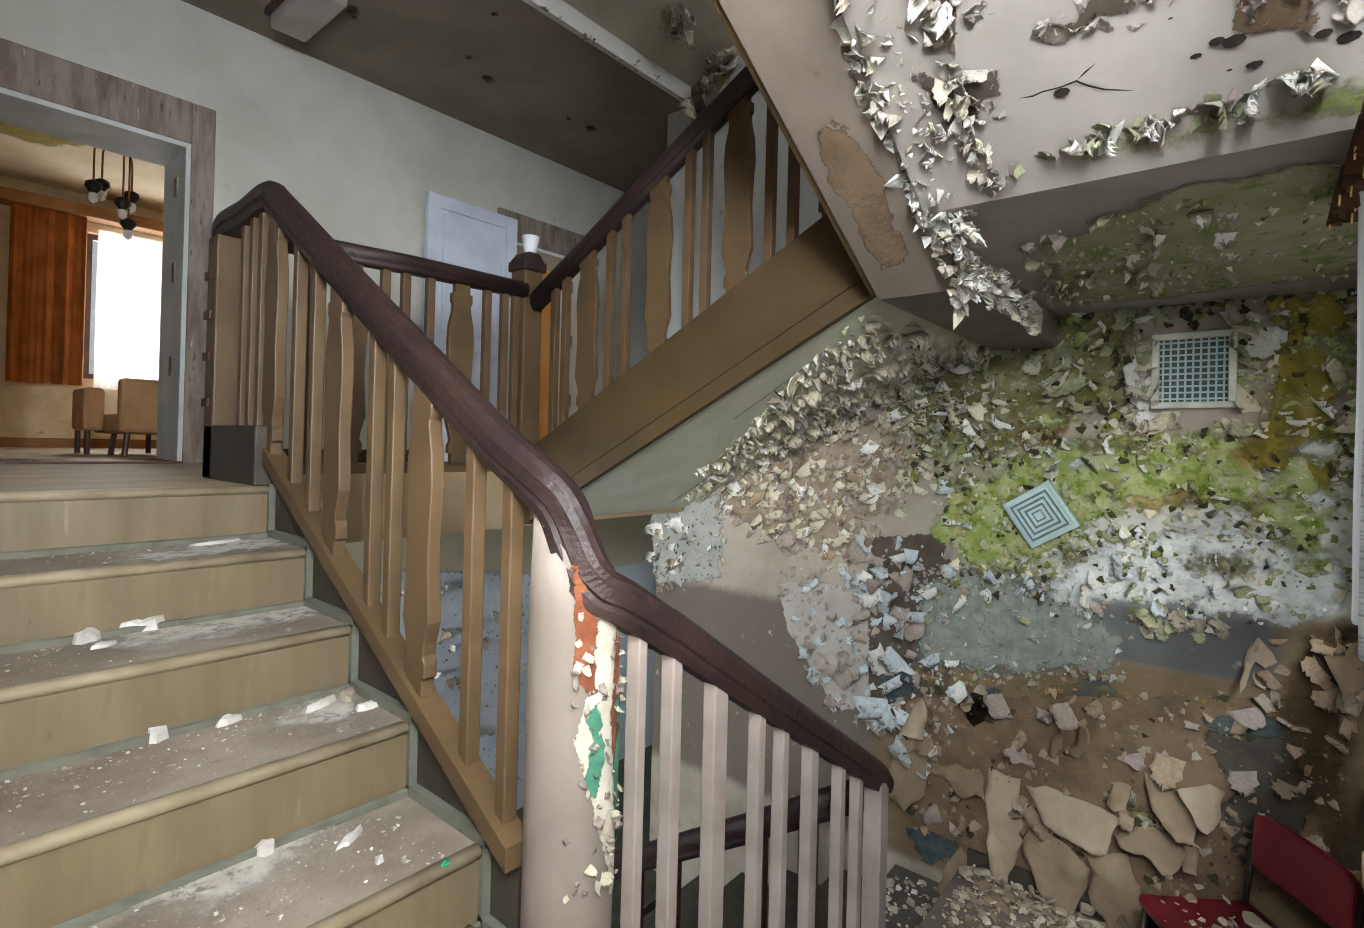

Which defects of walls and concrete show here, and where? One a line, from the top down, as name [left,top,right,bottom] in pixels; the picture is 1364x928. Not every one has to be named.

crack [1023,63,1133,98]
leakage [1040,162,1358,303]
peeling [643,0,1364,928]
leakage [1018,394,1073,446]
peeling [563,564,628,904]